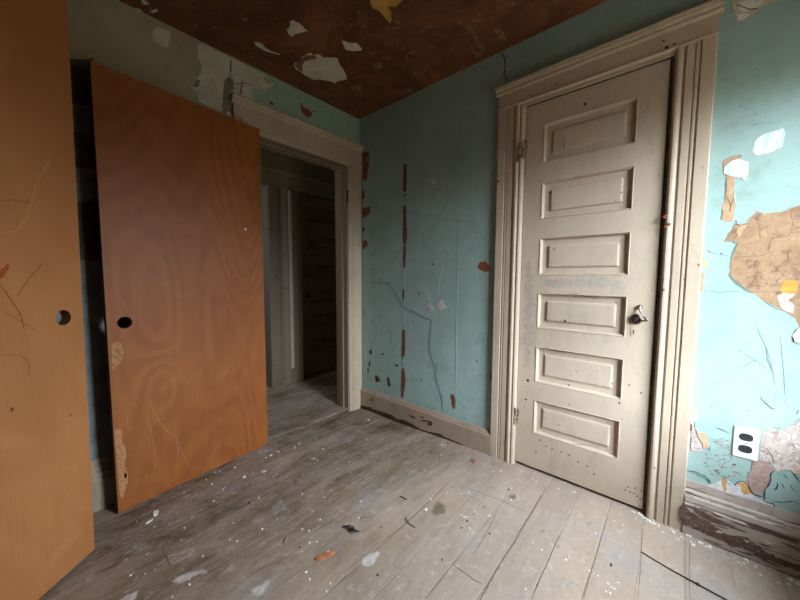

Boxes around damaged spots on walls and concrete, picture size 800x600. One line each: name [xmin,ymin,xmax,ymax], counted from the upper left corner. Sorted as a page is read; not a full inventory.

flaking render [191,43,275,118]
flaking render [287,20,308,37]
flaking render [293,52,348,84]
flaking render [342,41,363,51]
peeling [730,0,788,22]
peeling [362,151,370,218]
flaking render [724,203,800,343]
peeling [395,311,406,398]
crack [389,269,443,410]
peeling [360,399,464,446]
flaking render [688,405,800,507]
peeling [680,505,800,572]